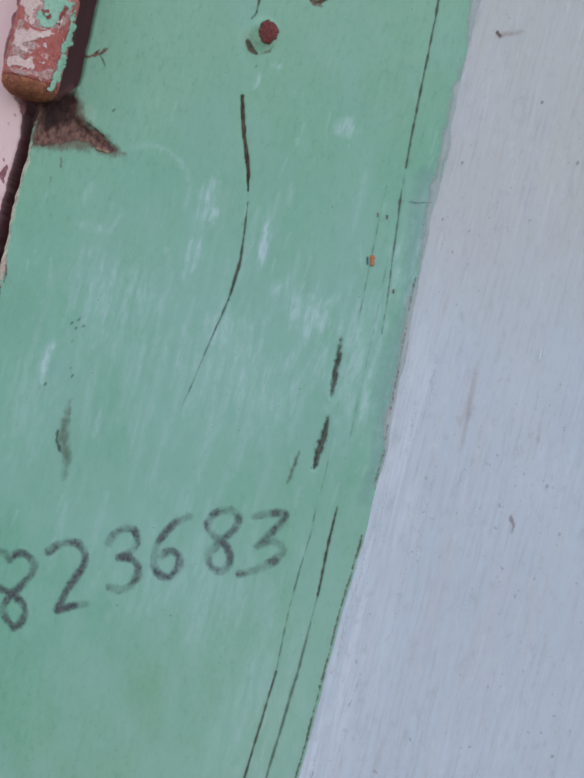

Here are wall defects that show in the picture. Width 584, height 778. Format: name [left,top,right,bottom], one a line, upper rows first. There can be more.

crack [405,0,439,168]
crack [241,94,250,191]
crack [212,218,246,336]
crack [388,193,402,293]
crack [314,508,337,596]
crack [295,535,362,778]
crack [243,671,277,778]